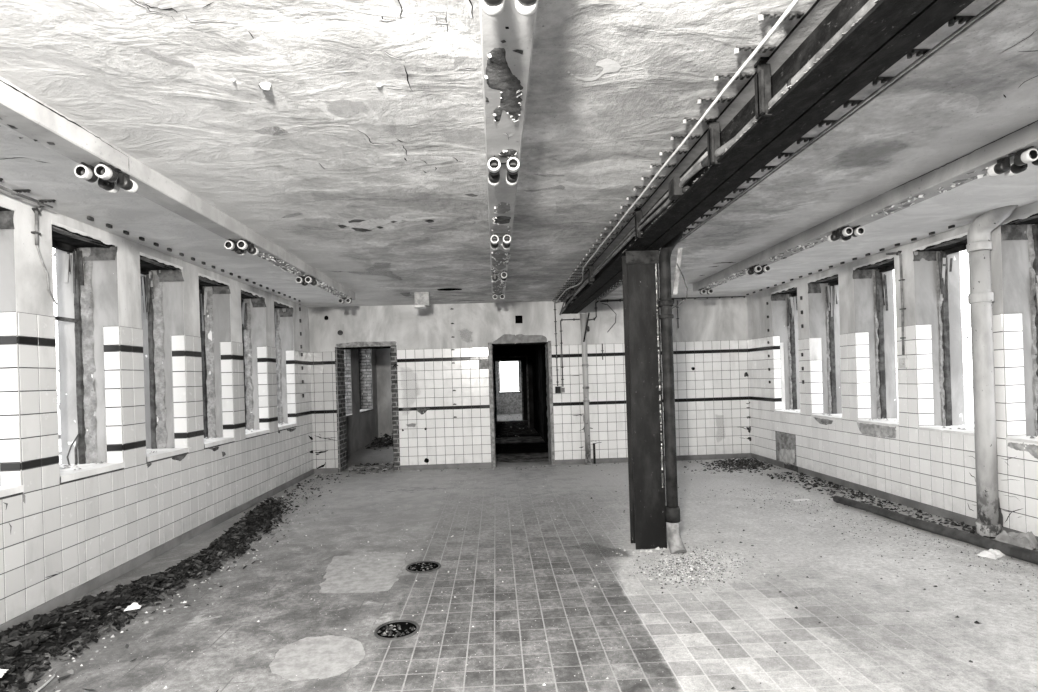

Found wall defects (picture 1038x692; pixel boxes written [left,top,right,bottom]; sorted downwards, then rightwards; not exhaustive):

crack [130,0,254,39]
crack [378,0,403,23]
crack [429,0,473,32]
crack [381,50,412,97]
peeling [485,27,523,122]
spalling [776,433,795,465]
spalling [1008,442,1038,459]